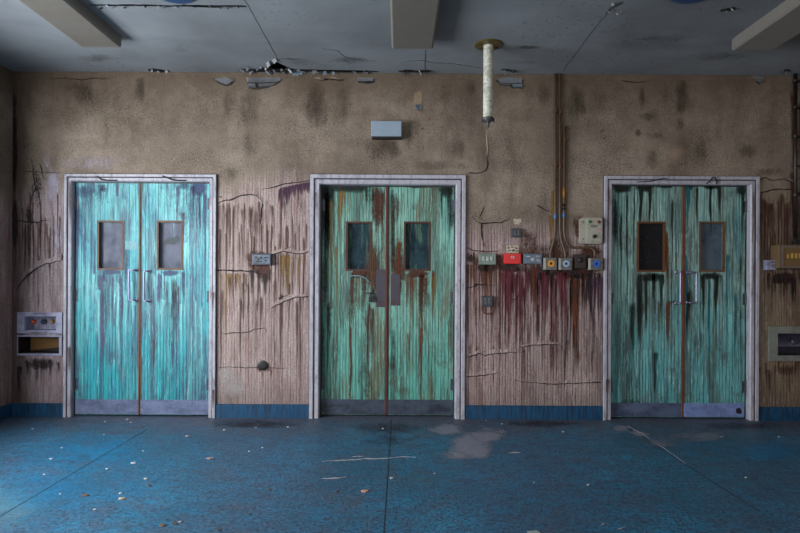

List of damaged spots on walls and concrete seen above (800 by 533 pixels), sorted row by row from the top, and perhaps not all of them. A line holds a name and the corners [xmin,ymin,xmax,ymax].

peeling [212,59,379,90]
crack [16,159,56,226]
rust [366,188,399,231]
crack [271,244,309,254]
crack [15,252,63,294]
crack [217,268,263,276]
rust [348,244,381,358]
rust [391,242,434,315]
rust [466,190,599,375]
leakage [764,269,799,303]
crack [466,306,568,386]
leakage [18,358,59,389]